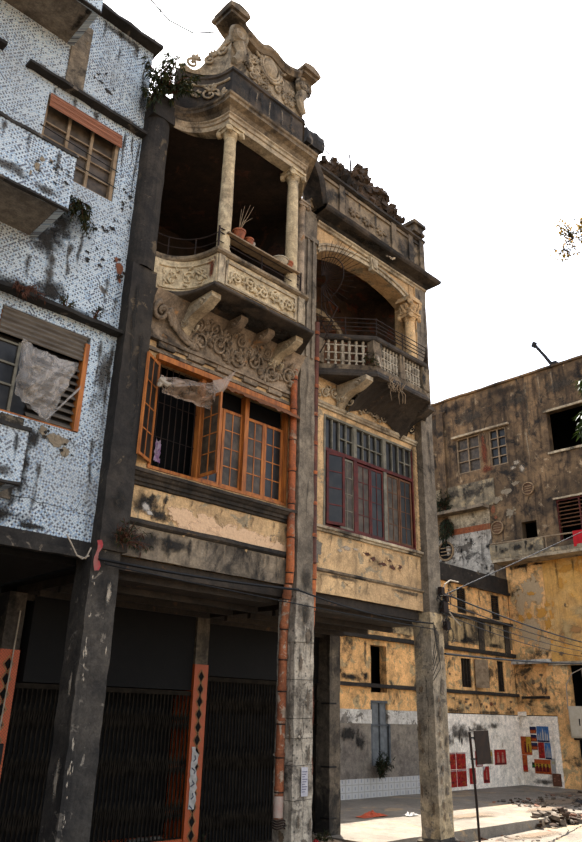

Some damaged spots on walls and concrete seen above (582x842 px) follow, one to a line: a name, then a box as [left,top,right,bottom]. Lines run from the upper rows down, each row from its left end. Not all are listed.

damp [445,380,534,440]
spalling [39,425,73,457]
damp [450,482,493,499]
damp [114,491,170,521]
damp [129,532,191,556]
peeling [362,551,403,571]
mould [340,727,365,749]
spalling [52,761,73,793]